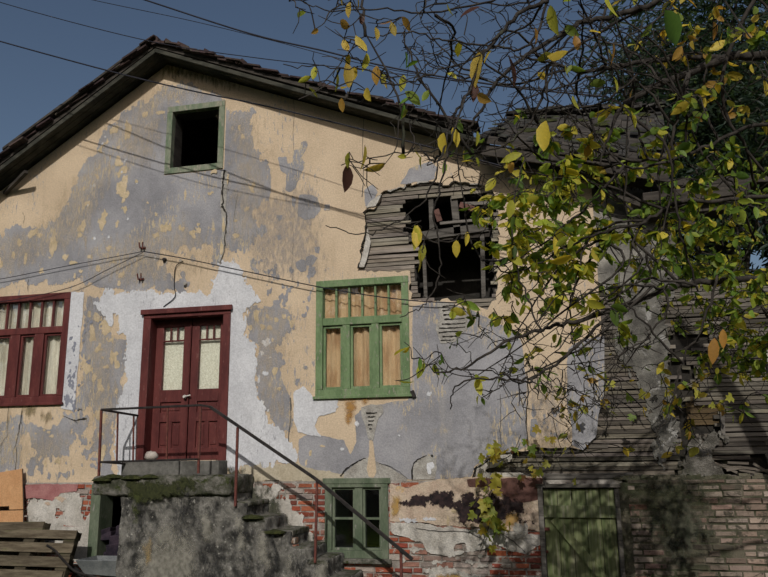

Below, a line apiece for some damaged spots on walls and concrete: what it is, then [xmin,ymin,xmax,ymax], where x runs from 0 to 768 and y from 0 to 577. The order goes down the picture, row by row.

crack [210,169,238,262]
peeling [400,162,437,184]
peeling [0,80,330,476]
peeling [298,301,543,577]
peeling [566,336,604,450]
flaking render [592,186,768,577]
flaking render [8,484,92,577]
damp [127,488,226,577]
damp [236,517,326,577]
flaking render [253,482,325,541]
damp [649,477,712,566]